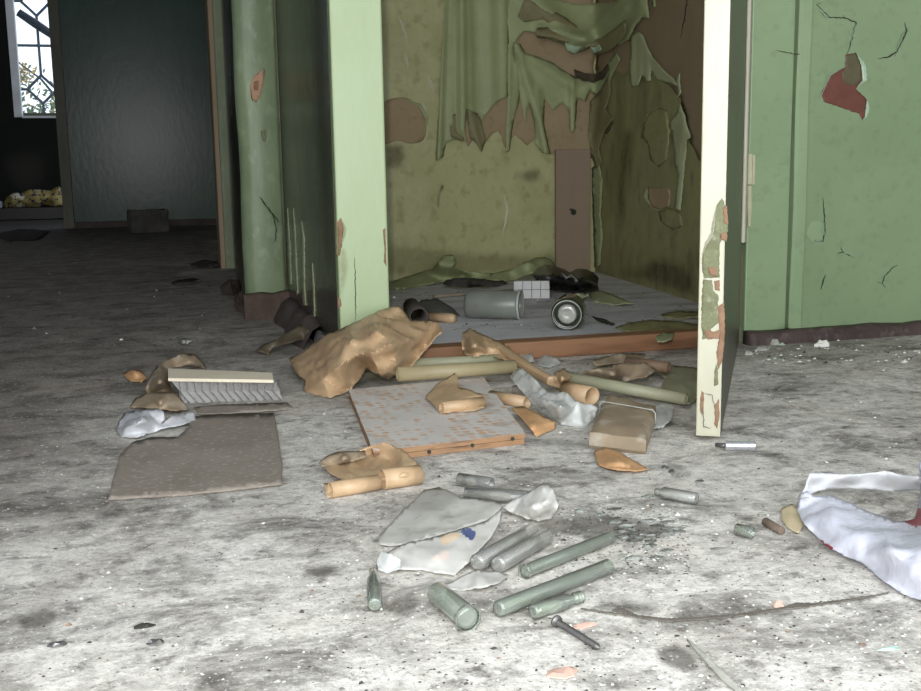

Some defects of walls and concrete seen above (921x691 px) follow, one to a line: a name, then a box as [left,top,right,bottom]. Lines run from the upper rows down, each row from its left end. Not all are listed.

crack [816,3,857,53]
crack [878,24,908,59]
peeling [250,68,265,102]
peeling [821,52,869,120]
peeling [384,0,704,268]
crack [260,197,279,240]
peeling [615,198,729,386]
peeling [700,391,720,428]